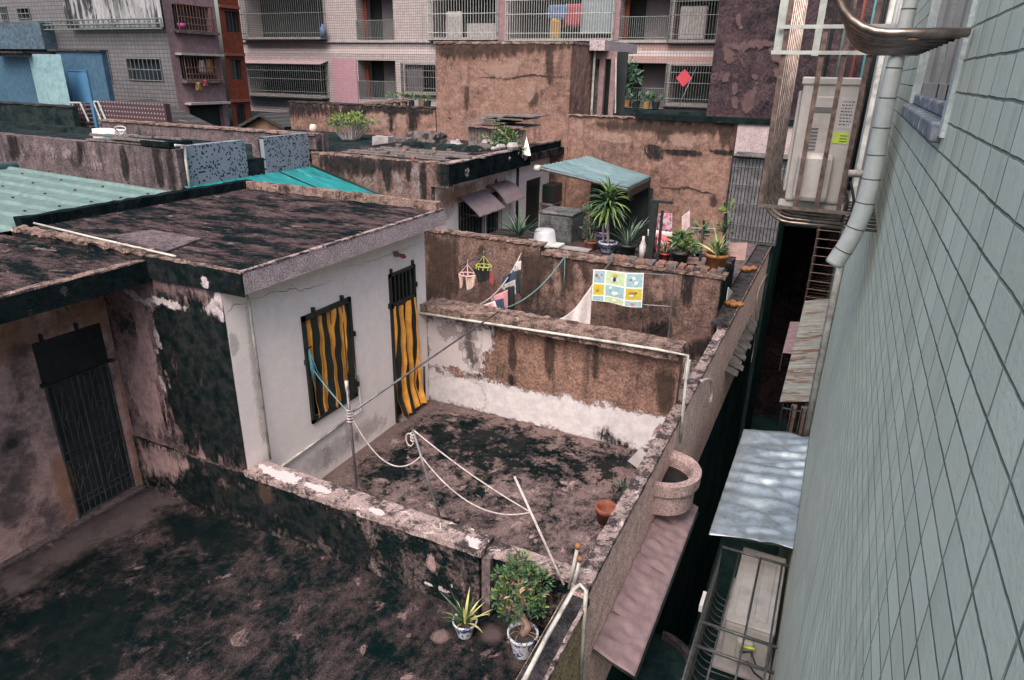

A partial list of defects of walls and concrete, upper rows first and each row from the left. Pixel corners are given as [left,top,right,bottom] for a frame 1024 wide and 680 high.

crack [480,74,562,82]
peeling [722,14,781,114]
water stain [6,135,19,161]
water stain [119,145,130,181]
water stain [149,148,176,190]
flaking render [124,276,224,483]
water stain [508,334,517,385]
peeling [427,316,666,451]
water stain [544,337,555,380]
water stain [655,371,676,412]
water stain [0,261,378,680]